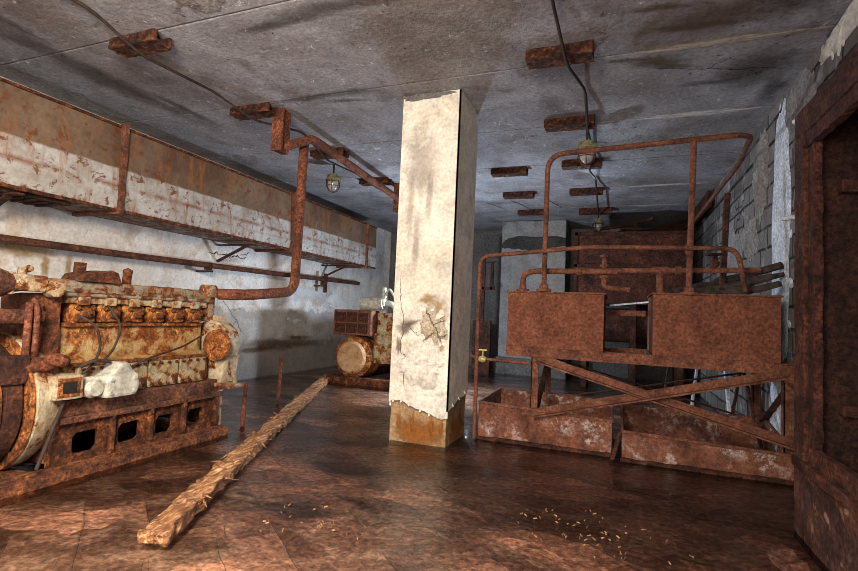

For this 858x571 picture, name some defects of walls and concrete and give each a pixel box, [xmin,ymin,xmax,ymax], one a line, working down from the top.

damp [641,29,806,54]
flaking render [727,0,858,362]
flaking render [391,391,466,420]